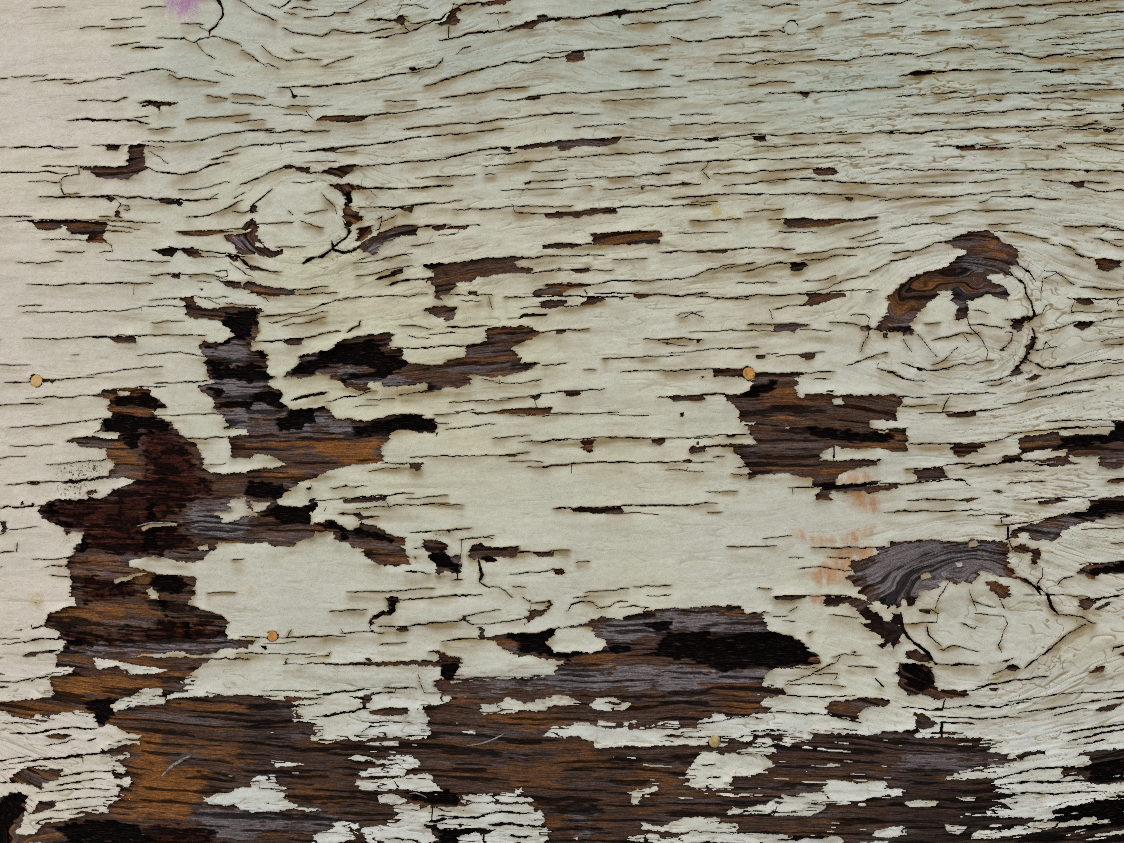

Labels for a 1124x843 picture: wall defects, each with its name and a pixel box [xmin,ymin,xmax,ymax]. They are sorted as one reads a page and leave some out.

crack [0,673,51,688]
crack [0,0,1124,663]
peeling [0,206,1124,843]
crack [682,527,1124,796]